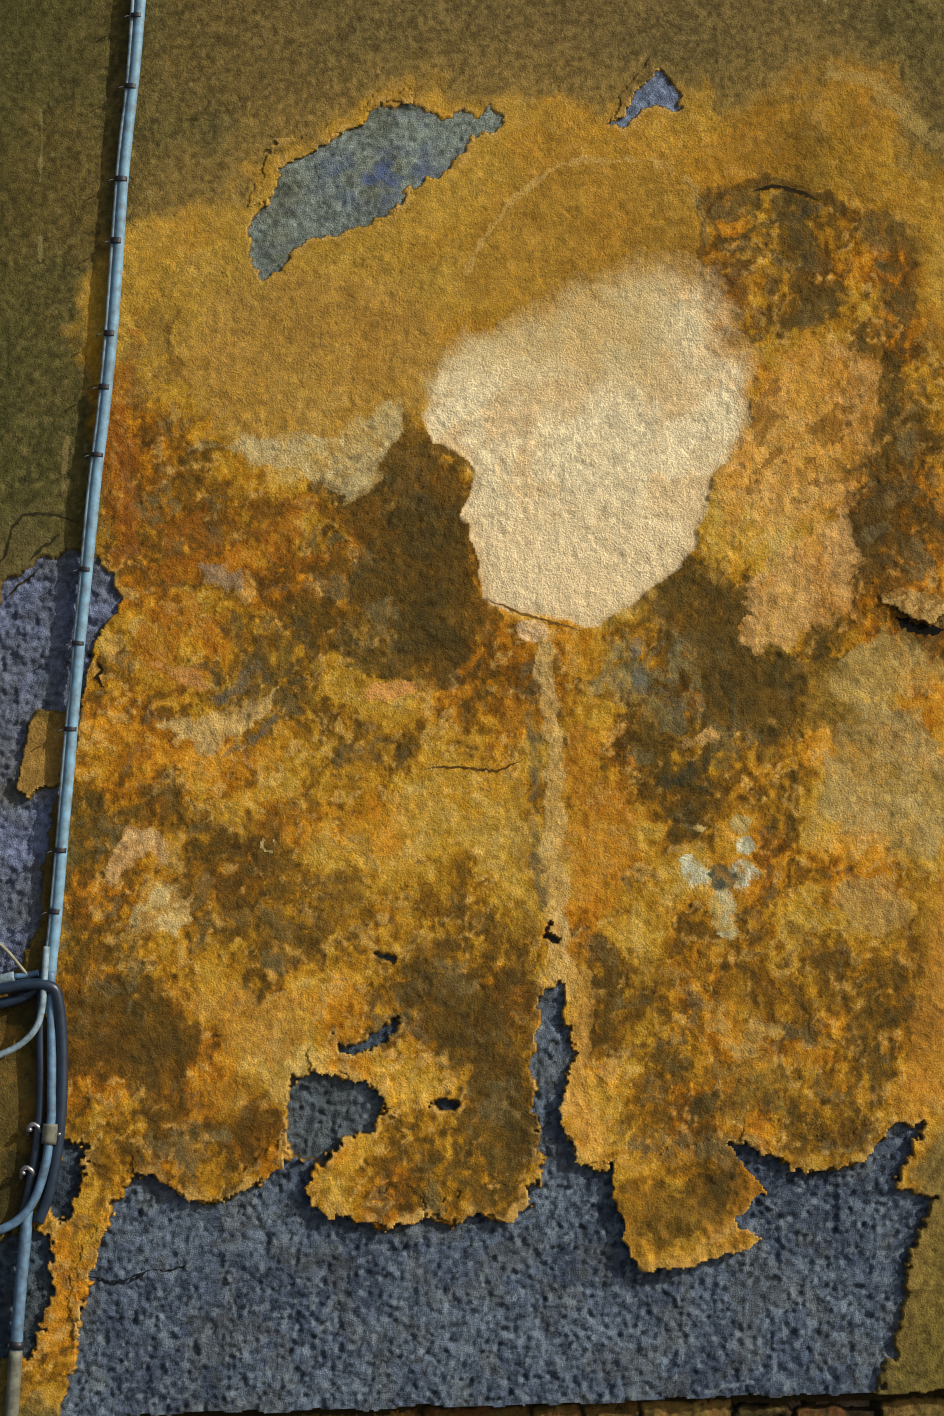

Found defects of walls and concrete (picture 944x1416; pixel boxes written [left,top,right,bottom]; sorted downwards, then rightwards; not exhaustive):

flaking render [610,58,682,127]
crack [752,184,817,200]
leakage [118,305,196,425]
crack [0,512,81,601]
flaking render [164,87,944,938]
leakage [602,171,944,804]
crack [896,616,944,636]
flaking render [0,550,122,974]
leakage [80,762,381,968]
leakage [137,412,944,1183]
leakage [68,936,287,1151]
flaking render [0,979,932,1416]